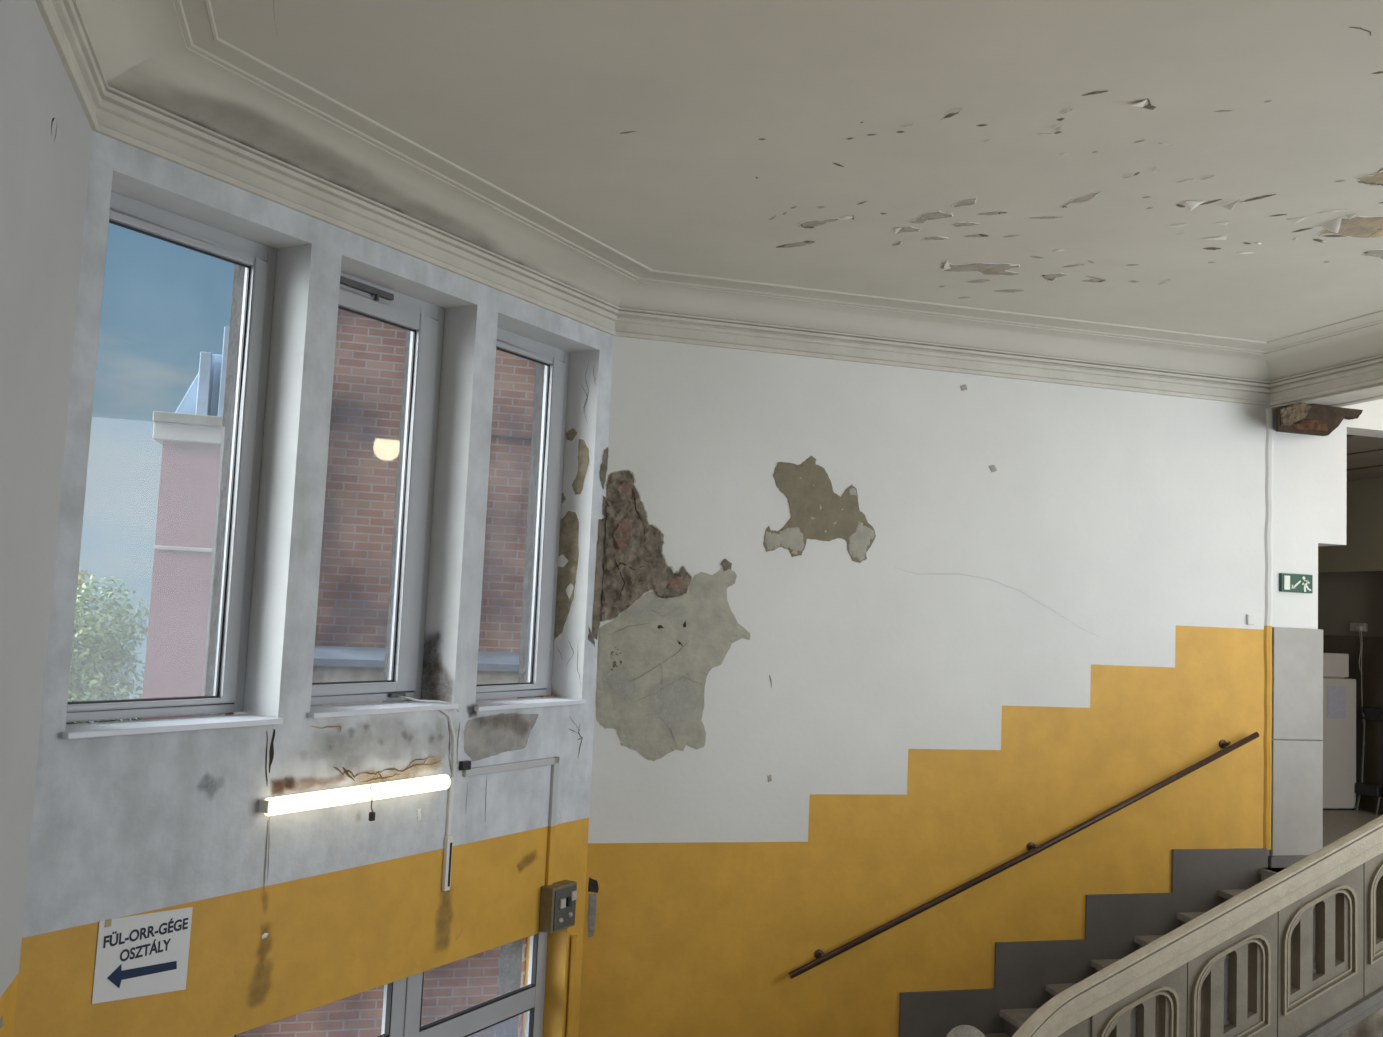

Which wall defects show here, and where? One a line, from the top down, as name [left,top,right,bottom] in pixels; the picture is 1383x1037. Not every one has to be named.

peeling [1040,91,1108,134]
peeling [1131,98,1156,110]
peeling [769,201,867,248]
peeling [892,198,1019,246]
peeling [1029,192,1101,219]
peeling [1171,194,1276,263]
peeling [1272,170,1383,261]
peeling [938,249,1107,299]
peeling [762,455,876,564]
peeling [554,361,751,762]